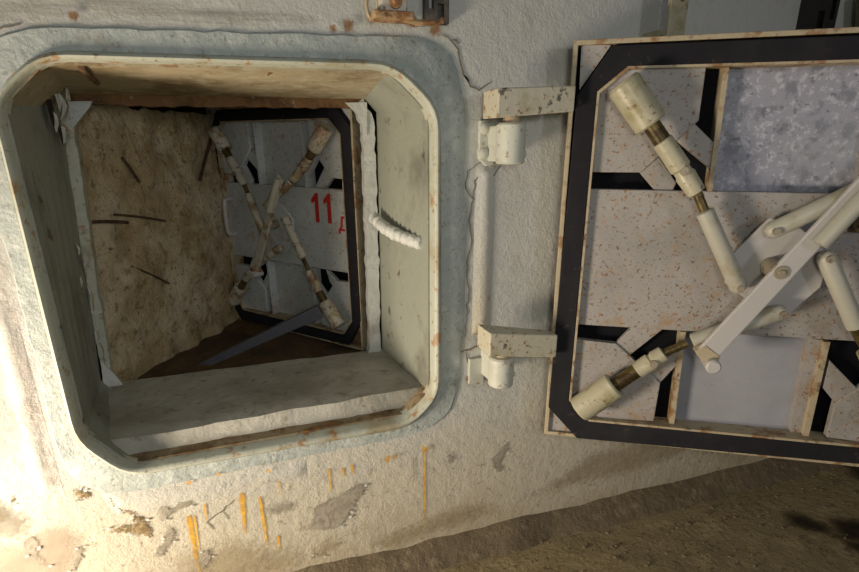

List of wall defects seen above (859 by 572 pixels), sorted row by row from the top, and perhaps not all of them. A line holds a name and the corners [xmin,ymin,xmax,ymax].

crack [442,34,491,91]
crack [461,162,501,363]
spalling [491,443,509,472]
water stain [0,505,24,537]
peeling [104,498,193,558]
rust [187,504,207,572]
rust [258,497,280,550]
spalling [301,484,367,532]